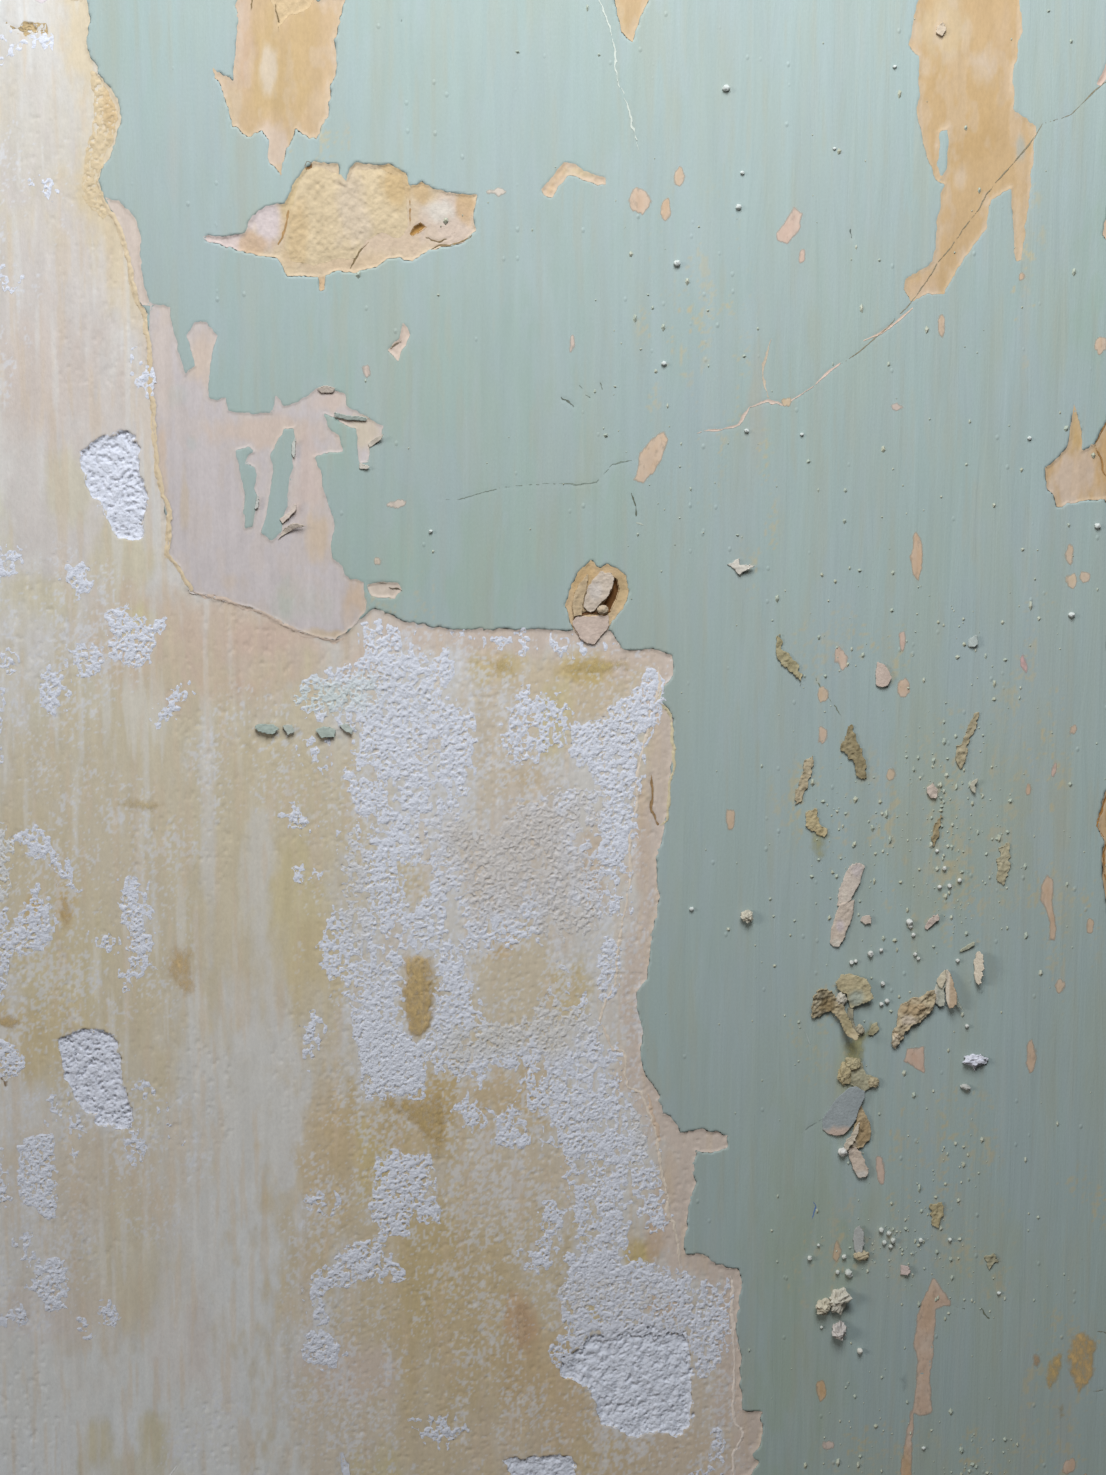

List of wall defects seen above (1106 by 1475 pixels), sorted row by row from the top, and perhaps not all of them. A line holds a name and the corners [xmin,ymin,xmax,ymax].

peeling [615,0,649,42]
peeling [203,0,506,291]
peeling [904,0,1036,301]
crack [699,82,1106,433]
peeling [1045,406,1106,507]
flaking render [39,603,167,716]
flaking render [80,197,735,1438]
flaking render [0,822,83,1002]
damp [403,957,432,1035]
flaking render [0,1029,186,1220]
flaking render [0,1231,122,1340]
flaking render [502,1454,577,1475]